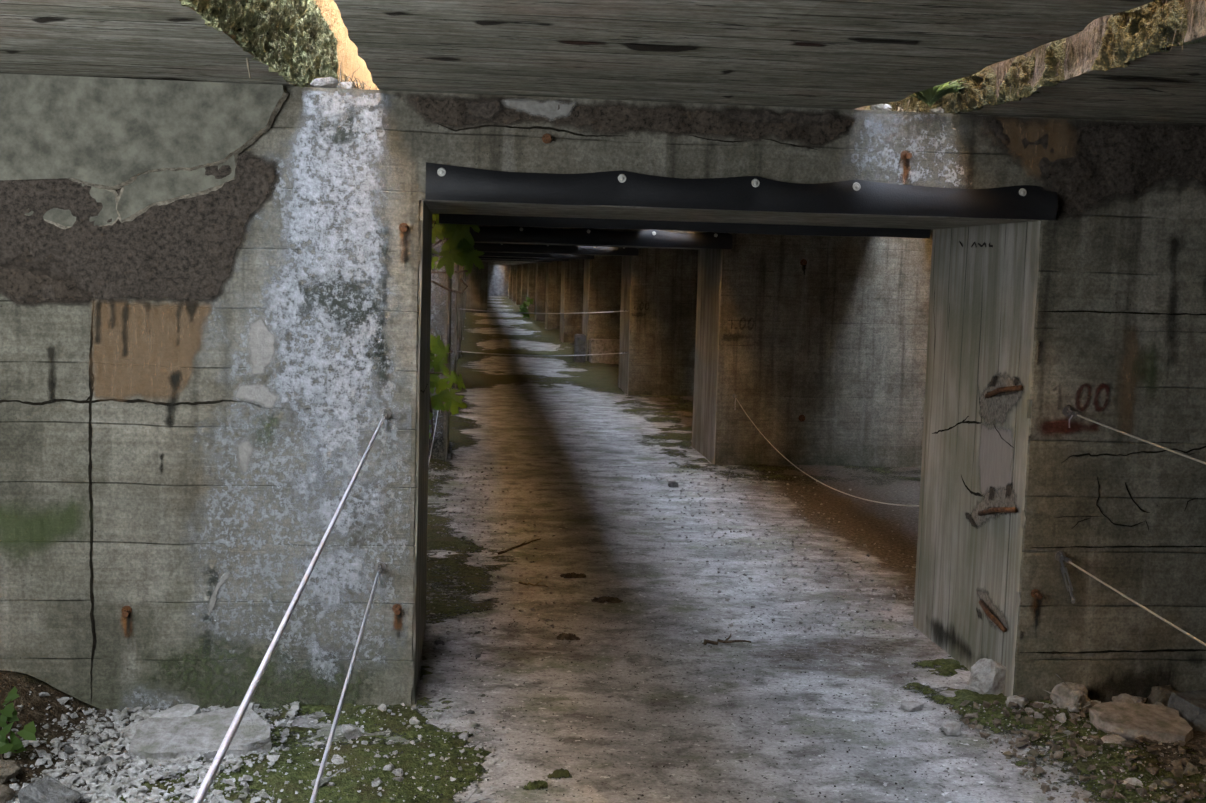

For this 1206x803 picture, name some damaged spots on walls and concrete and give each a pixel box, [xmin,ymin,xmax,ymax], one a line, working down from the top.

flaking render [0,73,288,305]
rust [400,230,408,263]
leakage [93,295,223,426]
leakage [127,90,411,710]
leakage [0,502,78,554]
crack [0,300,332,698]
crack [1032,446,1206,548]
rust [393,613,401,637]